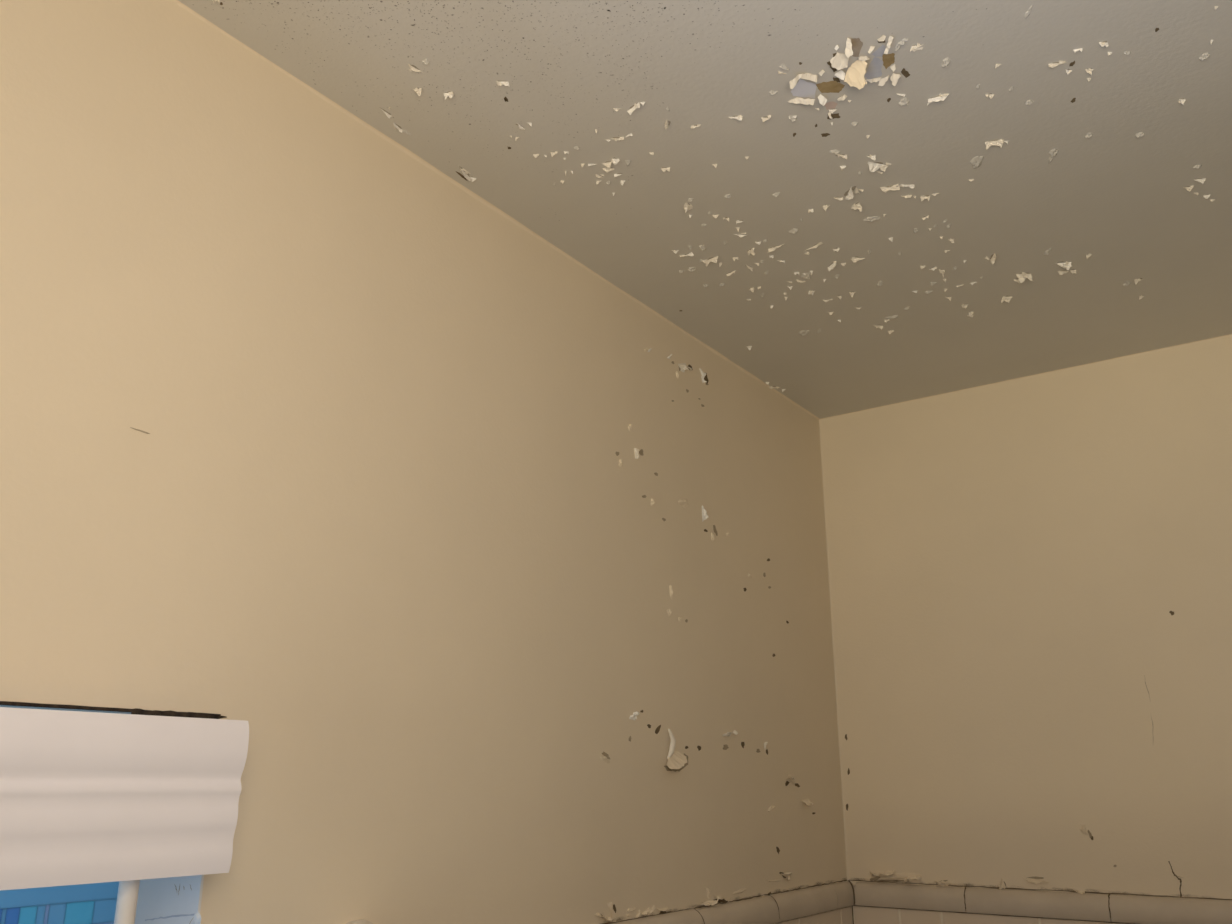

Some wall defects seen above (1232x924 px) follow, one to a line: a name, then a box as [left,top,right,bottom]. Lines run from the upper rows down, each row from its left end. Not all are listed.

peeling [1048,48,1093,82]
peeling [533,146,631,196]
peeling [671,35,954,323]
peeling [969,139,1008,182]
peeling [1183,165,1215,202]
peeling [1044,248,1077,275]
peeling [874,253,996,334]
peeling [1001,272,1032,303]
peeling [667,354,709,407]
peeling [629,710,701,772]